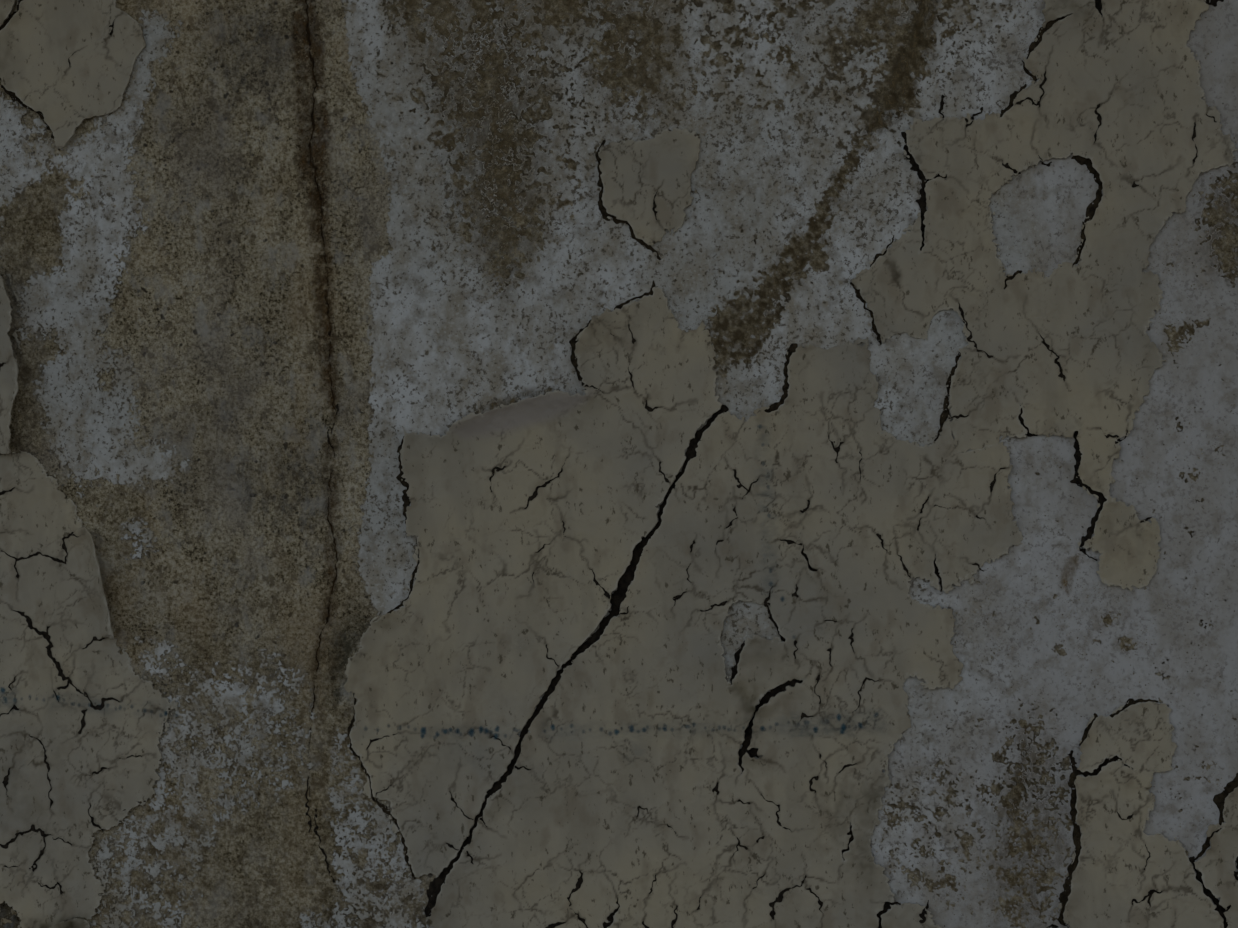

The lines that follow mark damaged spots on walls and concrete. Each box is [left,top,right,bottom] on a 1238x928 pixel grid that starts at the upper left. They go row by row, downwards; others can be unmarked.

peeling [0,0,146,149]
crack [850,132,947,345]
crack [1002,104,1139,266]
crack [934,302,993,441]
peeling [340,0,1238,928]
crack [1070,428,1128,561]
crack [12,610,120,734]
peeling [0,266,179,928]
crack [348,404,729,917]
crack [0,676,142,894]
crack [546,870,701,928]
crack [1189,773,1238,928]